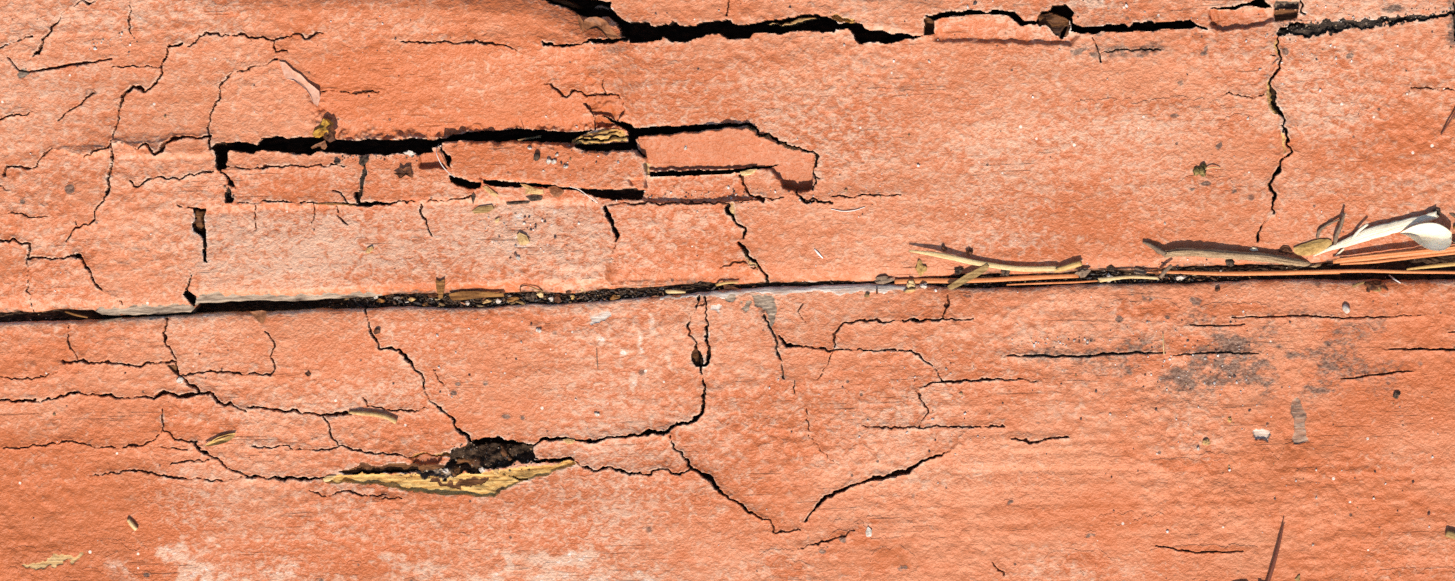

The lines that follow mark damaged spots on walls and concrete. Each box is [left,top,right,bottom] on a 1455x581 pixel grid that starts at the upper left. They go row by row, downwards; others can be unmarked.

crack [0,1,901,312]
peeling [441,127,816,192]
crack [403,0,1455,242]
crack [0,309,472,500]
peeling [412,453,443,466]